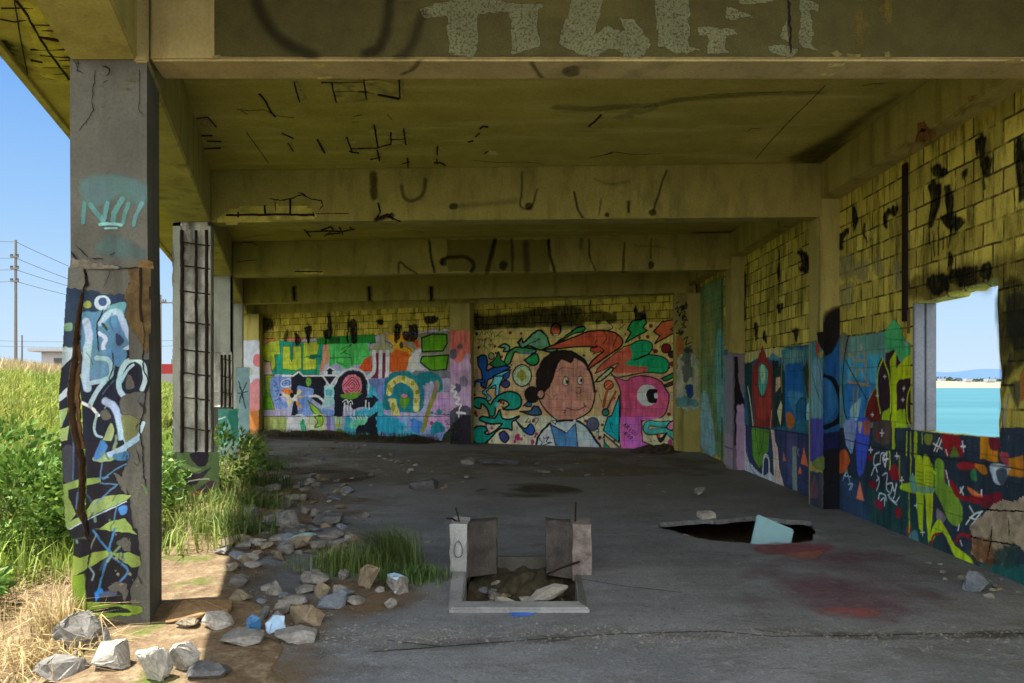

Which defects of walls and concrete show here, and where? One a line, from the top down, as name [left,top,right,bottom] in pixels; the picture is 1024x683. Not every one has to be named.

crack [785,0,793,52]
crack [73,60,95,131]
spalling [71,247,154,356]
peeling [970,496,1024,569]
crack [373,628,790,652]
crack [822,630,1023,638]